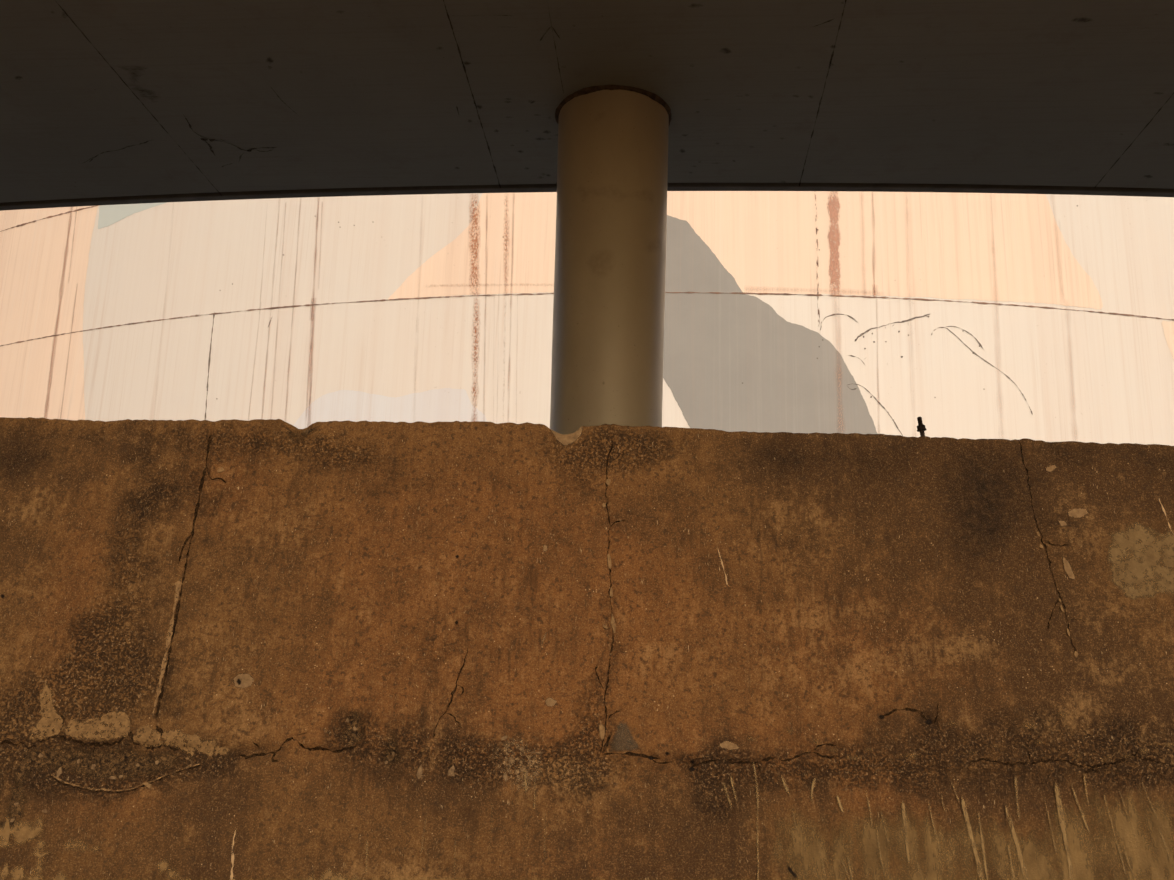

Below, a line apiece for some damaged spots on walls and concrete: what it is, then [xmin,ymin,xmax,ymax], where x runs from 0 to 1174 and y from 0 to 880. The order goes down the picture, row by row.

rust [471,202,479,286]
rust [815,196,840,322]
crack [1019,442,1084,658]
crack [0,435,226,793]
crack [595,439,838,770]
crack [236,733,356,762]
crack [433,650,468,738]
crack [883,705,938,722]
crack [969,749,1174,773]
water stain [774,776,1174,880]